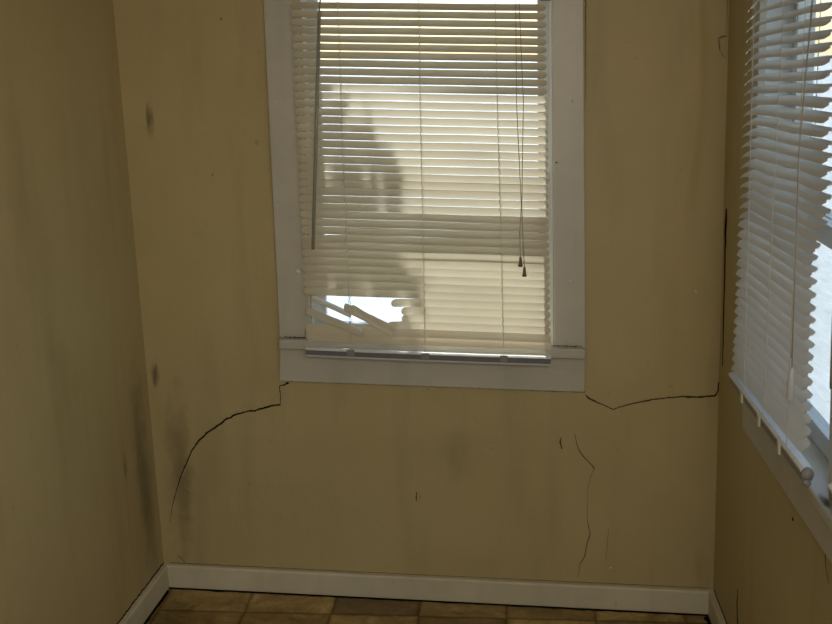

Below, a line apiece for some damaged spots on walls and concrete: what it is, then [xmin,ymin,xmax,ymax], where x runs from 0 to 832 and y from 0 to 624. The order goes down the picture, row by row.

crack [586,209,727,410]
crack [170,382,289,520]
crack [574,433,609,578]